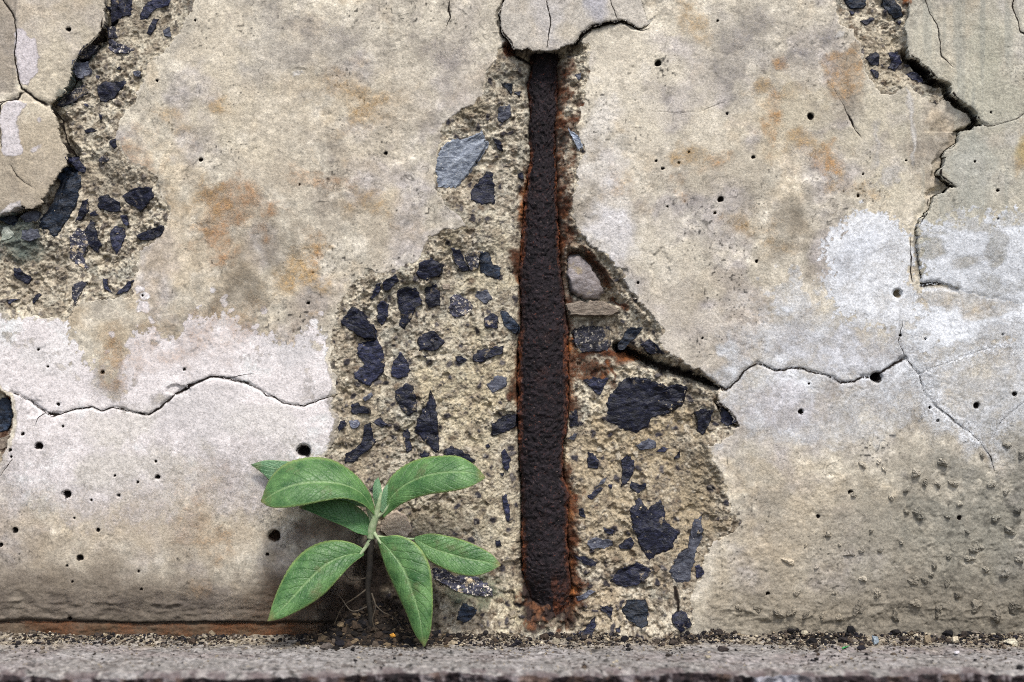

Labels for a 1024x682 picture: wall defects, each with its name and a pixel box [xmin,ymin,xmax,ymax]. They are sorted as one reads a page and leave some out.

crack [0,0,107,218]
crack [499,0,649,67]
rust [554,60,629,311]
flaking render [836,0,1024,303]
crack [906,0,1023,287]
crack [14,373,337,422]
spalling [0,0,742,640]
rust [507,355,520,402]
rust [567,340,640,418]
crack [621,323,1022,469]
damp [717,200,1024,451]
rust [515,465,587,634]